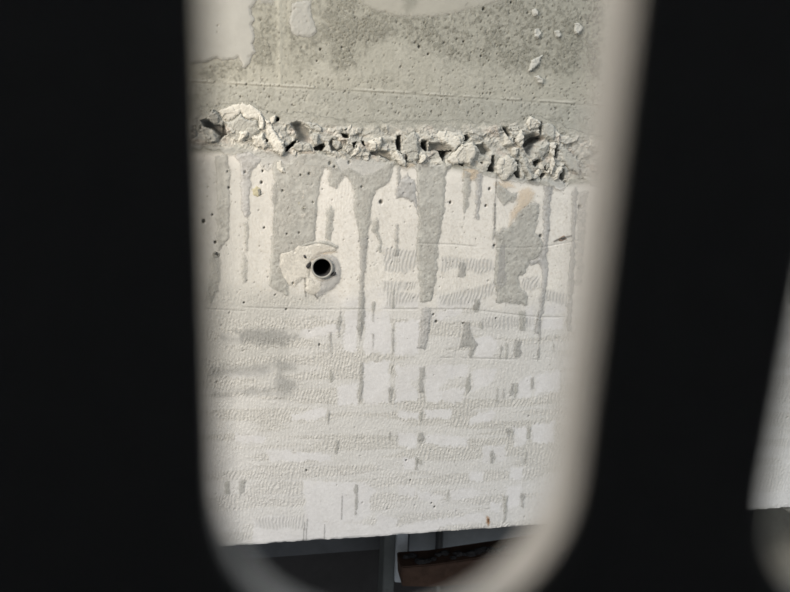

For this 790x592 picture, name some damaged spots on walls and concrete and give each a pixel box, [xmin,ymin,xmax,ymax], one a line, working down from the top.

leakage [215,152,261,250]
leakage [462,170,482,219]
leakage [269,153,453,348]
leakage [492,181,552,339]
leakage [459,322,478,358]
leakage [500,340,522,359]